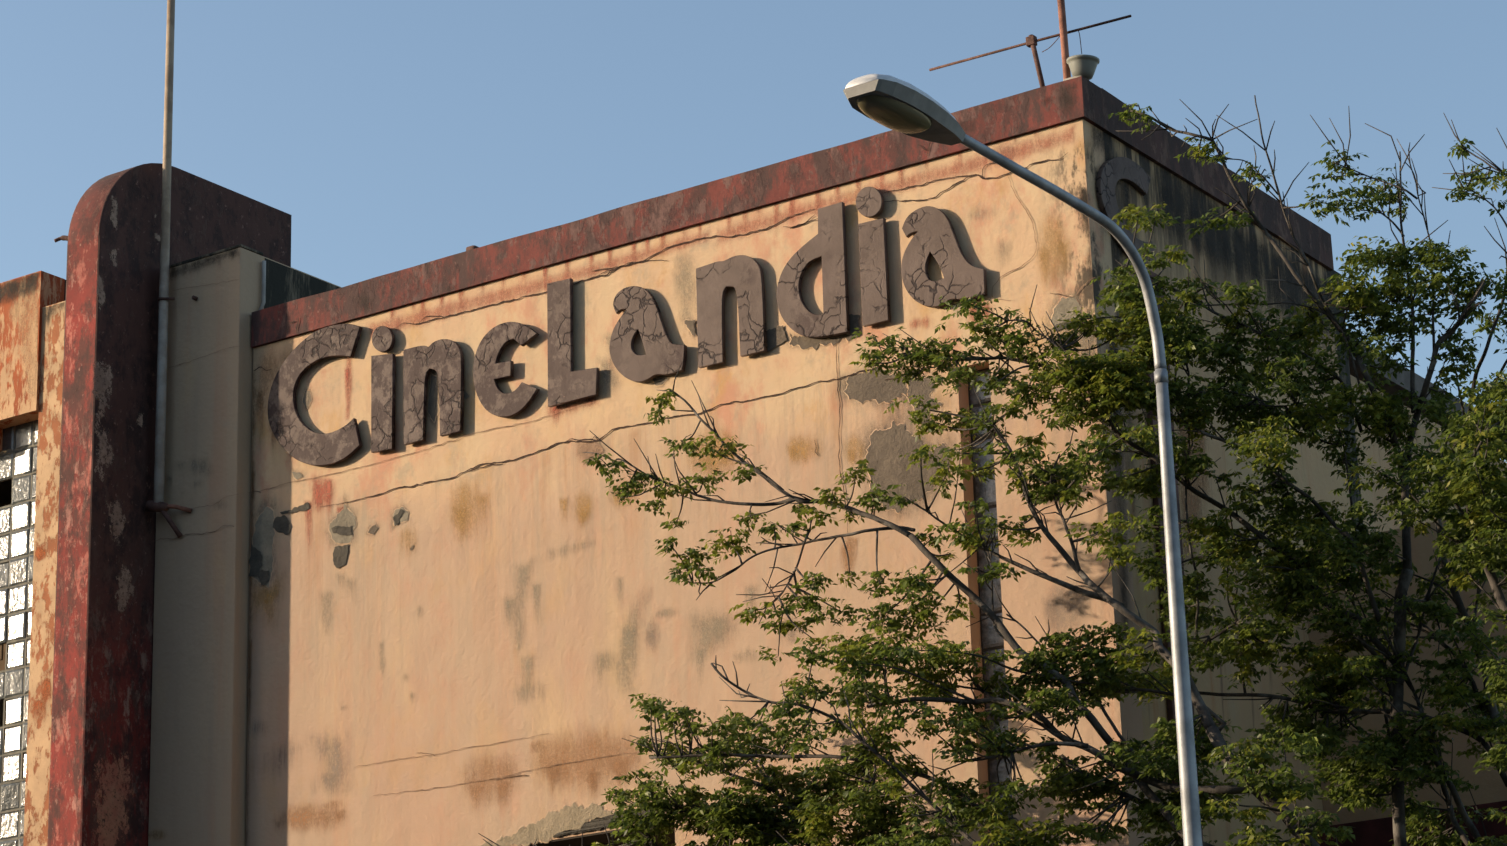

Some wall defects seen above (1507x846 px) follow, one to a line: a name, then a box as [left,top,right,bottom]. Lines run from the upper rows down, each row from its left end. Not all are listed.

crack [397,209,818,327]
crack [884,141,1067,301]
peeling [92,358,136,612]
peeling [248,502,309,588]
peeling [329,503,409,569]
crack [157,338,936,541]
peeling [842,368,951,514]
peeling [82,753,134,846]
peeling [478,802,651,846]